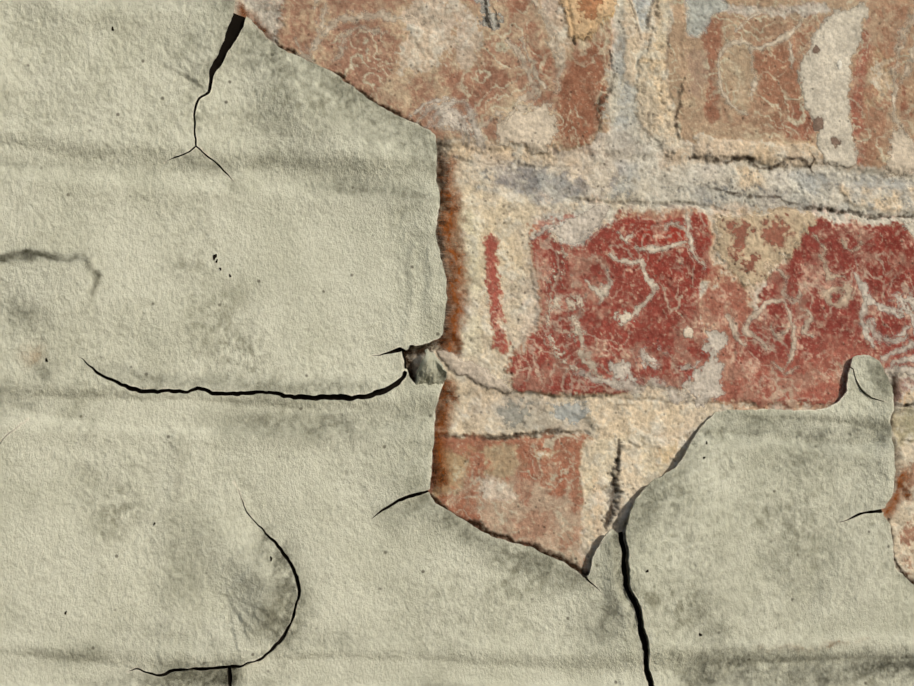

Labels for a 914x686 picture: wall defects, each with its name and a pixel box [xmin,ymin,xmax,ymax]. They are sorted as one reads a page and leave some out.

crack [168,13,246,177]
peeling [798,2,869,168]
crack [81,347,407,401]
peeling [0,0,648,686]
spalling [714,206,816,285]
crack [130,487,301,686]
crack [604,445,653,686]
peeling [625,355,914,686]